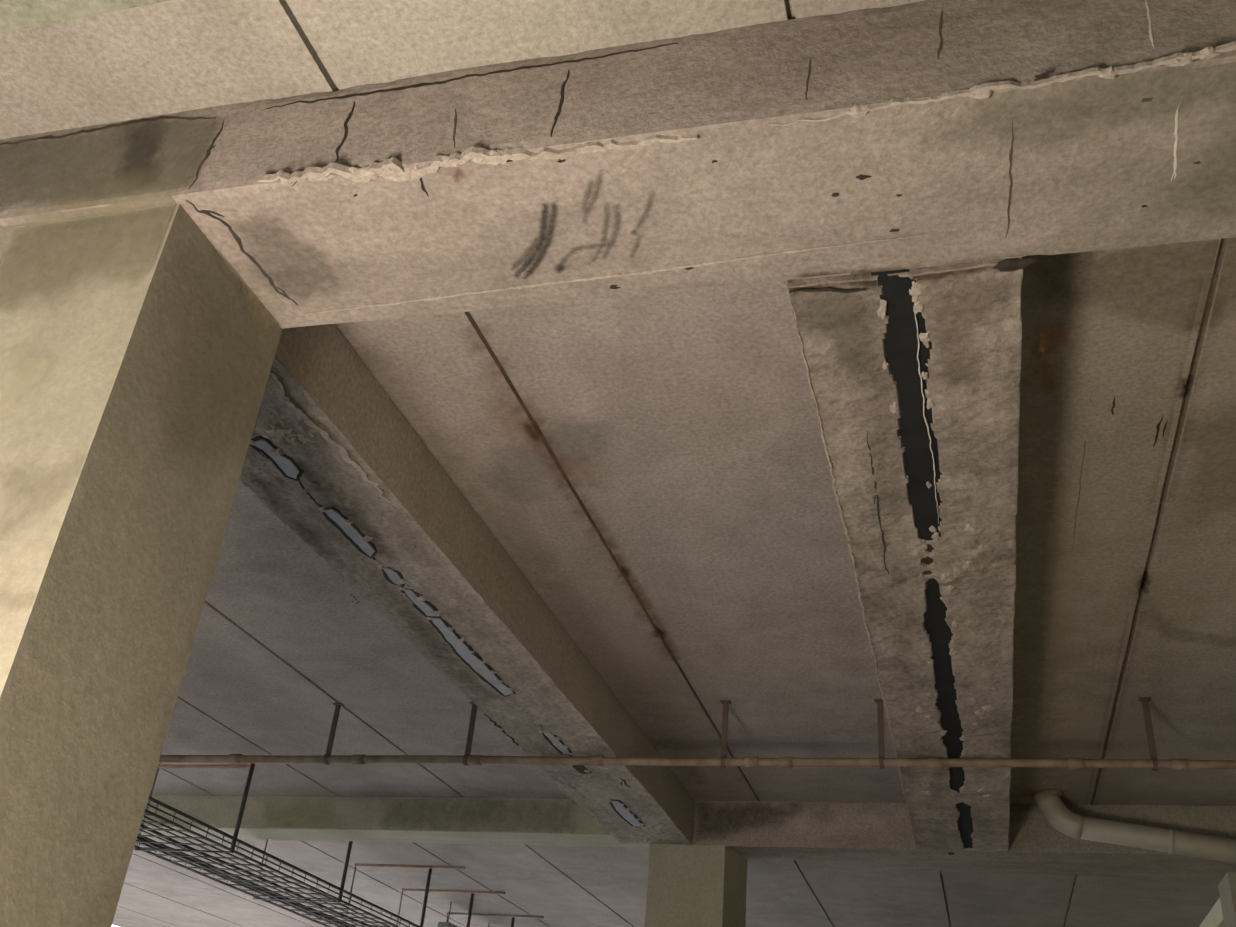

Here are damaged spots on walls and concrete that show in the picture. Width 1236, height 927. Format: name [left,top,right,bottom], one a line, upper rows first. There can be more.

crack [266,43,678,161]
crack [0,116,298,306]
damp [221,253,279,333]
spalling [249,436,304,481]
crack [1154,417,1168,446]
crack [867,431,889,575]
spalling [319,506,515,697]
spalling [538,729,592,774]
spalling [607,799,646,827]